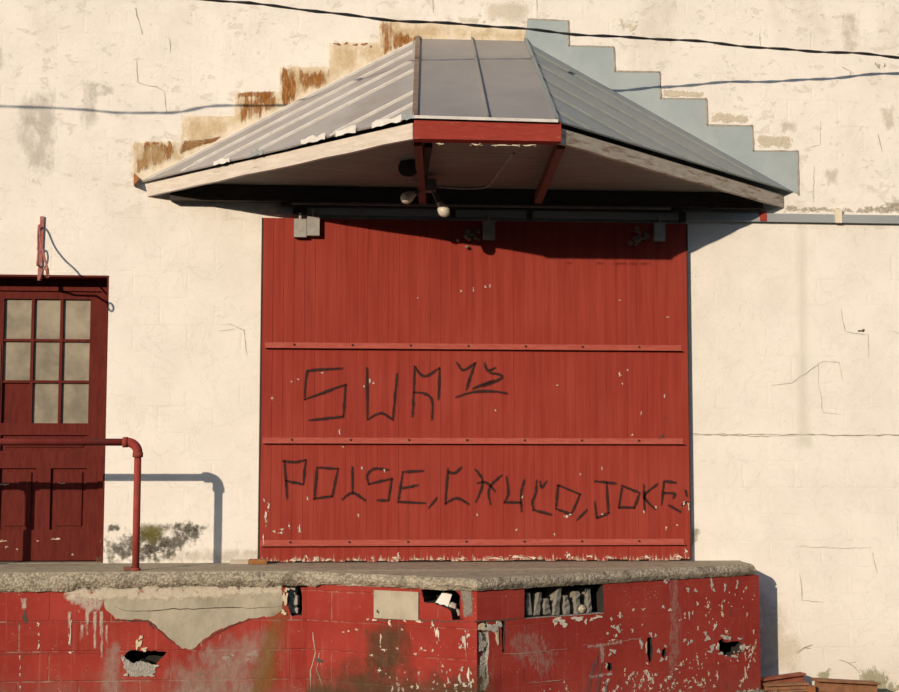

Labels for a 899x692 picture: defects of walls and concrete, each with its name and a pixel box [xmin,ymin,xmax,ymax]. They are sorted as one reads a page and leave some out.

rust [238,69,324,121]
rust [137,137,220,172]
crack [691,361,899,437]
damp [97,523,204,563]
peeling [448,590,472,617]
spalling [121,635,159,677]
damp [310,631,420,692]
spalling [432,621,502,692]
spalling [524,578,757,692]
damp [438,682,476,692]
damp [871,680,899,692]